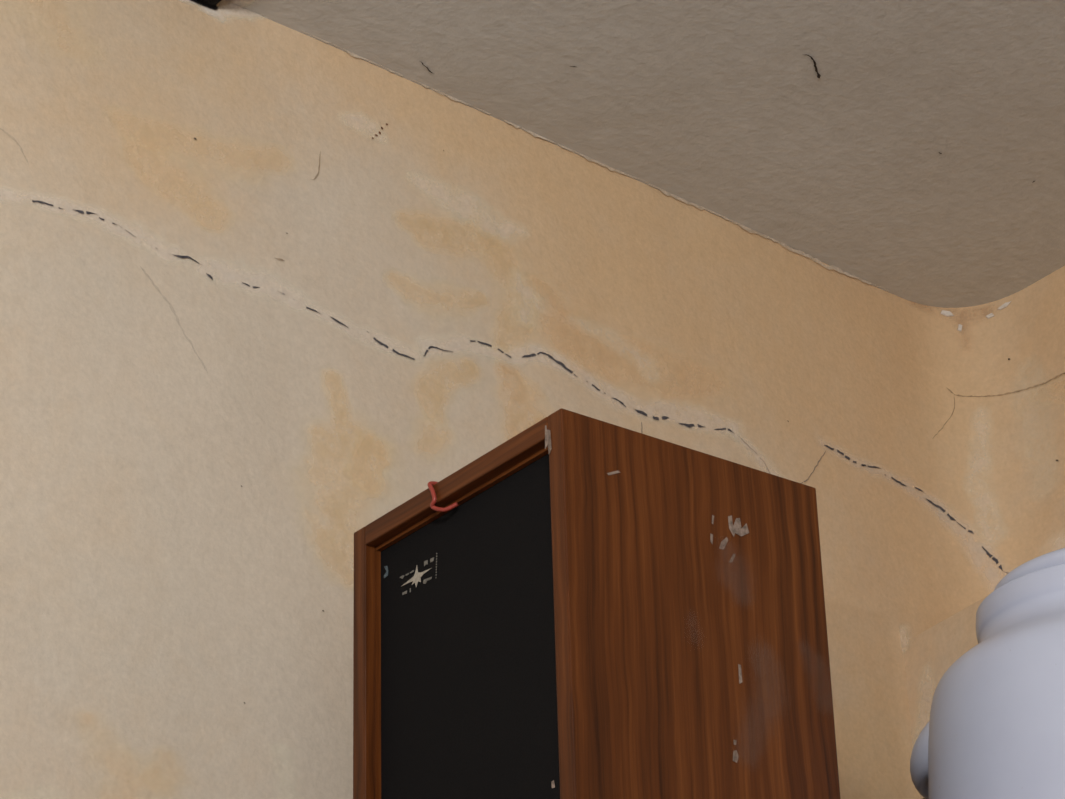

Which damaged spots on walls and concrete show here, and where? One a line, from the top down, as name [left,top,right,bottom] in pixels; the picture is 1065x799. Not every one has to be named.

crack [32,200,770,473]
crack [933,373,1065,438]
crack [801,445,1008,577]